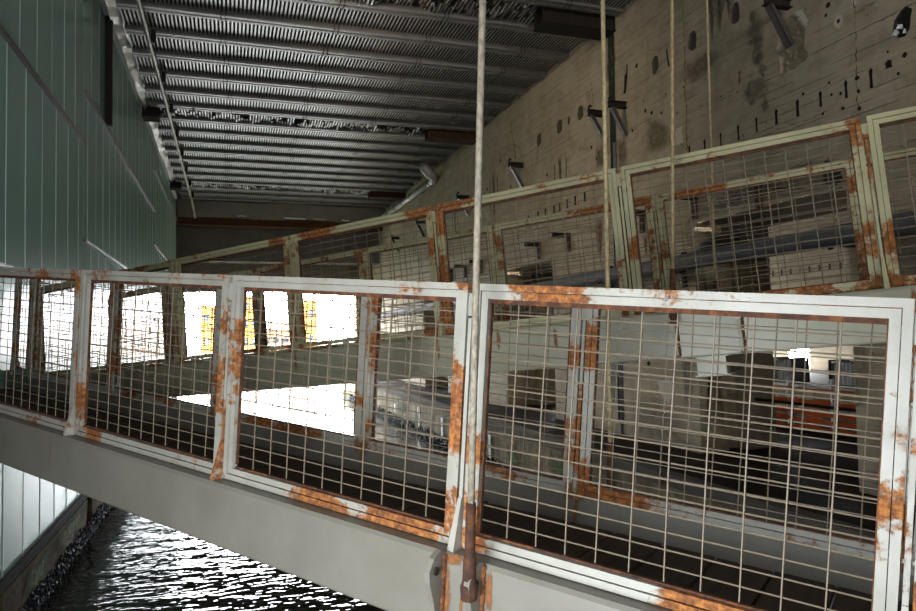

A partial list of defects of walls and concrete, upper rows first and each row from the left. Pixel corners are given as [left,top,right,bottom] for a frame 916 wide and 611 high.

damp [709,0,730,34]
spalling [776,14,808,76]